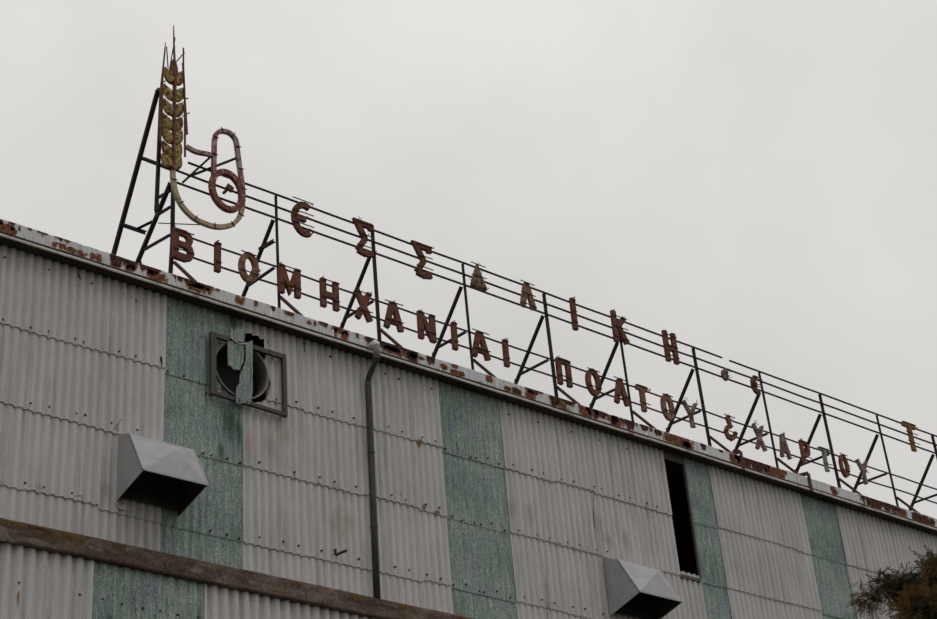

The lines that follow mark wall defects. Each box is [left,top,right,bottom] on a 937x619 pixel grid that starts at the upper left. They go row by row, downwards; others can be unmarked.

rust [0,219,220,295]
rust [307,320,465,376]
rust [504,385,706,450]
rust [718,449,788,478]
rust [859,495,935,526]